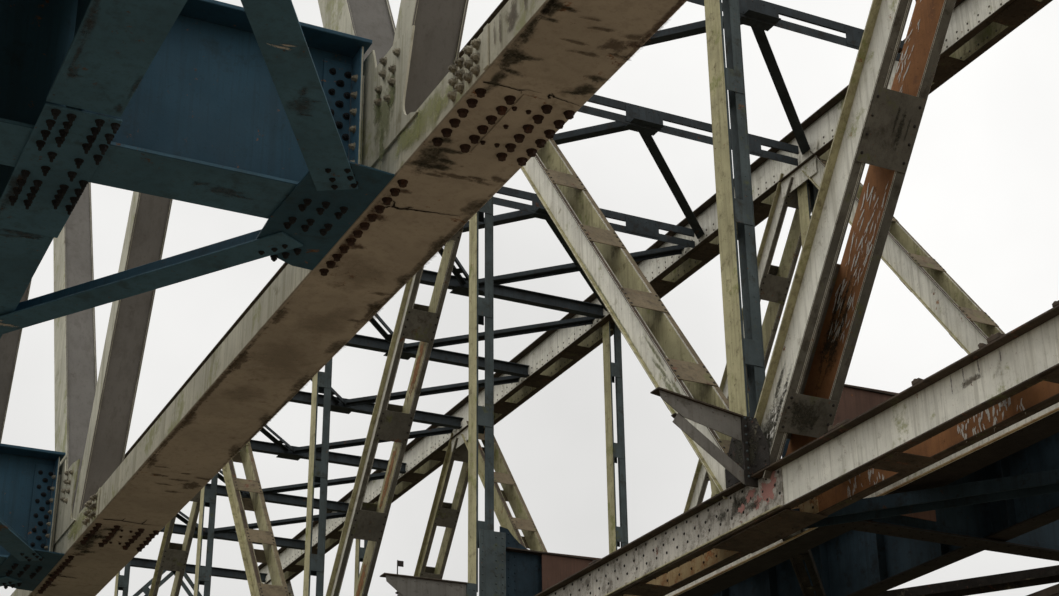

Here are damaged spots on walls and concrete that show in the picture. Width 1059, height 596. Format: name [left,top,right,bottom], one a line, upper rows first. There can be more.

leakage [487,0,645,90]
leakage [564,76,604,95]
peeling [896,19,920,93]
peeling [828,181,889,341]
leakage [133,311,288,493]
leakage [229,376,313,457]
peeling [957,398,1026,442]